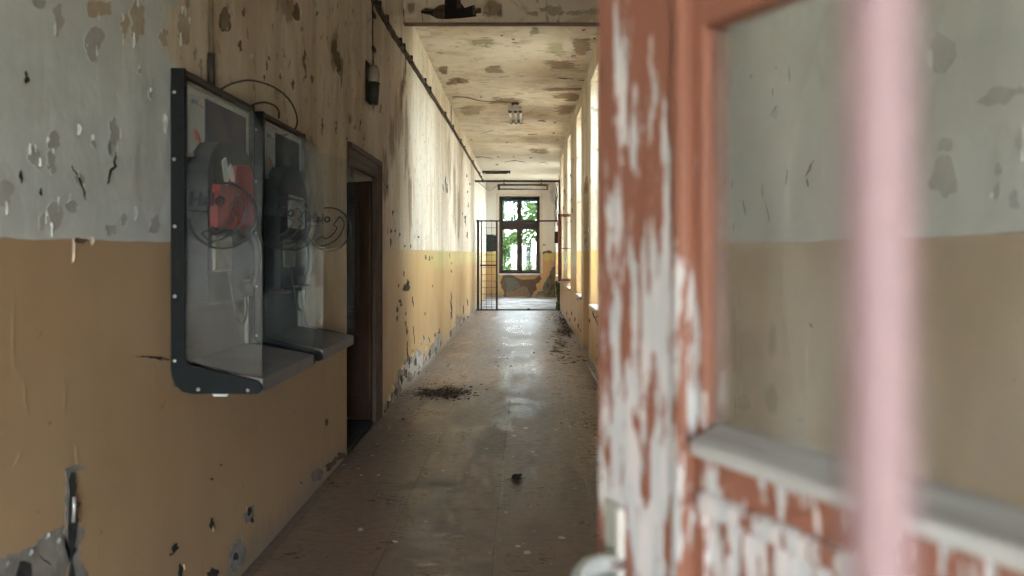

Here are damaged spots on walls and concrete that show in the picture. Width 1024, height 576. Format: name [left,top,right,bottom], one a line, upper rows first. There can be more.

peeling [83,0,145,62]
leakage [439,66,467,85]
leakage [543,87,582,101]
leakage [545,38,590,69]
peeling [0,130,60,214]
peeling [38,165,86,237]
peeling [77,117,121,184]
spalling [500,266,555,297]
crack [135,354,171,362]
spalling [383,314,469,415]
spalling [0,465,88,576]
spalling [169,543,185,576]